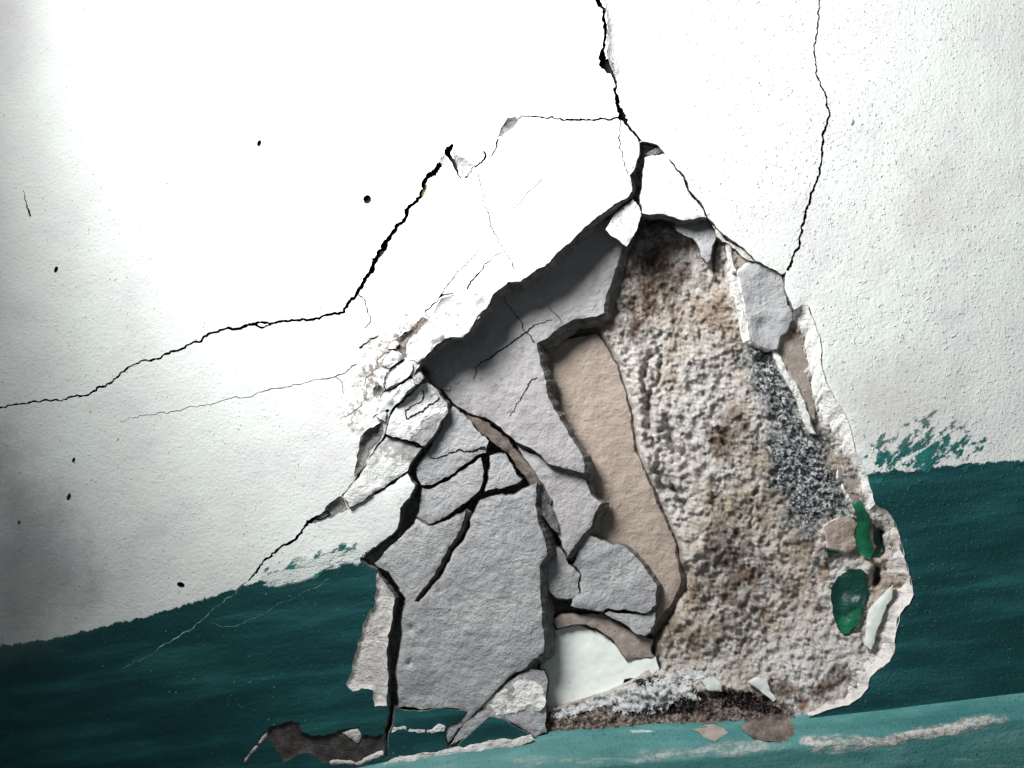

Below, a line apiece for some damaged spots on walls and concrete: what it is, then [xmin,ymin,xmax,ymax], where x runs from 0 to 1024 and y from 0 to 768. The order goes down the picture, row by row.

flaking render [439,152,475,177]
crack [518,0,641,173]
spalling [634,145,661,189]
crack [786,0,830,271]
crack [0,138,542,422]
flaking render [396,294,457,356]
peeling [261,443,449,706]
flaking render [354,422,383,477]
spalling [437,415,552,523]
spalling [537,218,1006,760]